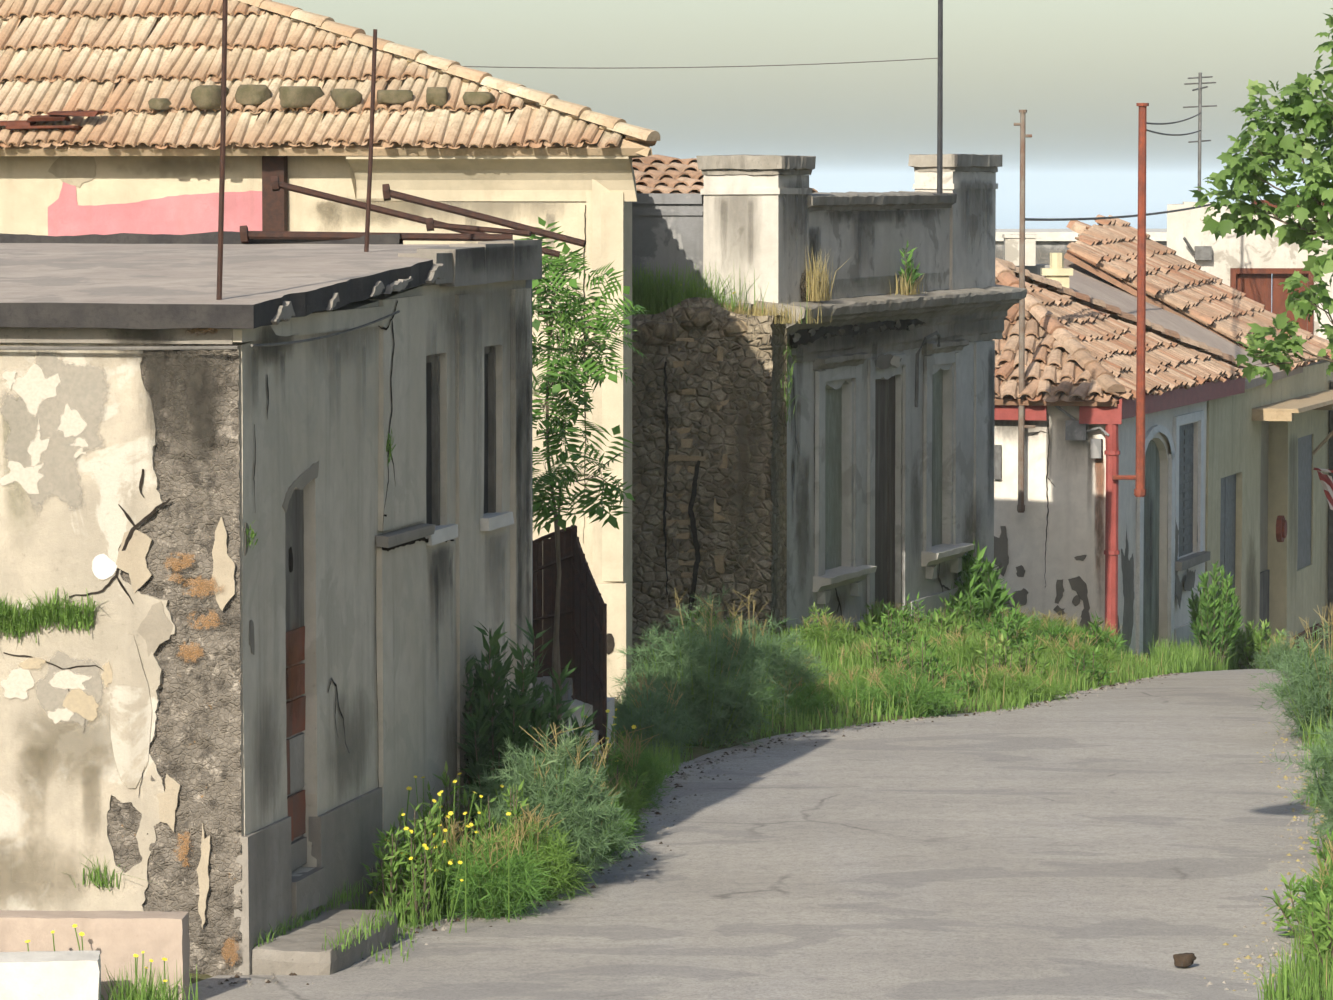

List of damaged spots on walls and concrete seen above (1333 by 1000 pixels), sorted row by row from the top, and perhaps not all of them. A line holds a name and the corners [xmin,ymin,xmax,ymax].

spalling [271,301,296,325]
spalling [370,264,446,296]
peeling [0,350,108,509]
crack [378,300,454,551]
peeling [0,652,113,727]
crack [69,469,171,604]
spalling [92,343,255,977]
crack [328,677,350,753]
crack [372,587,380,720]
peeling [994,526,1029,618]
peeling [1043,555,1091,630]
peeling [1118,531,1134,654]